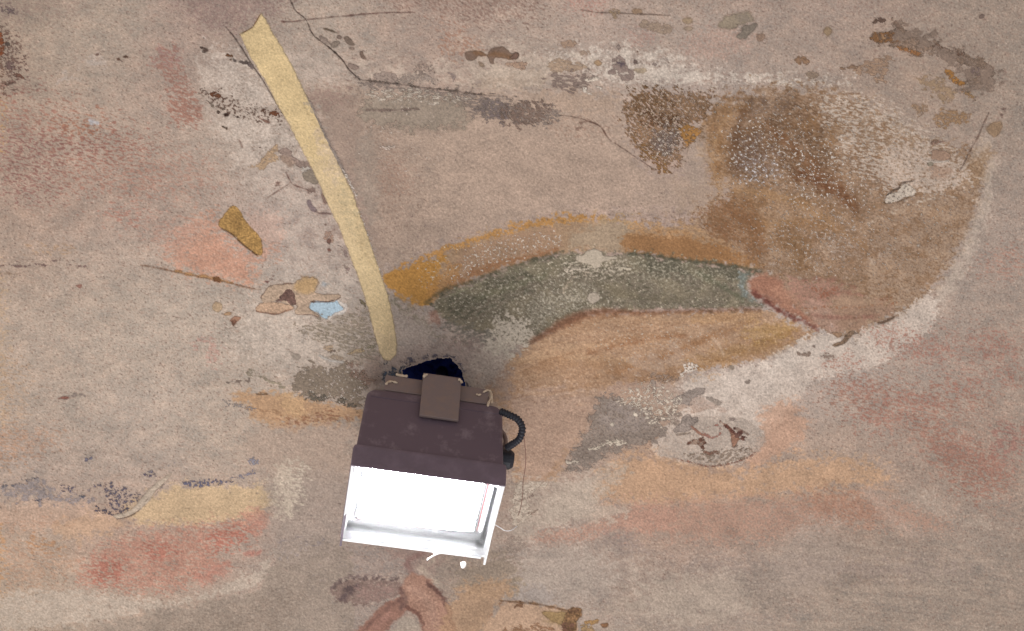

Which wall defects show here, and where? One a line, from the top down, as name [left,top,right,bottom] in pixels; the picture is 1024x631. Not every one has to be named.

crack [200,32,277,104]
crack [282,2,482,95]
corrosion [869,17,1004,101]
leakage [341,61,595,186]
leakage [713,89,956,279]
flaking render [256,277,348,320]
leakage [417,230,562,288]
leakage [246,303,469,408]
spalling [402,357,465,386]
peeling [588,439,627,451]
leakage [564,373,722,473]
spalling [615,382,756,467]